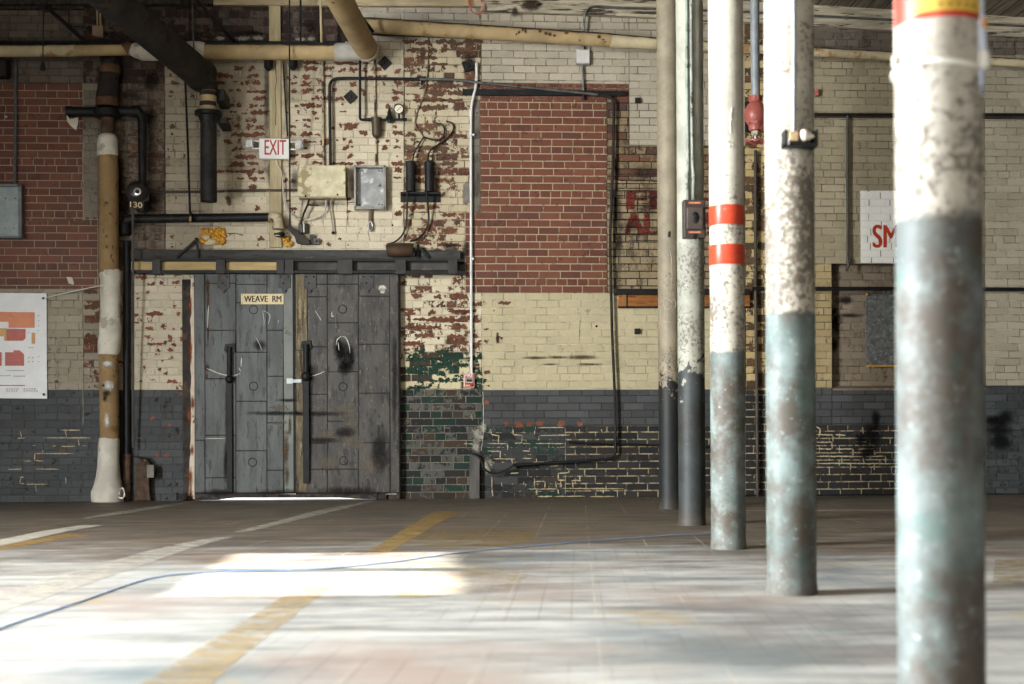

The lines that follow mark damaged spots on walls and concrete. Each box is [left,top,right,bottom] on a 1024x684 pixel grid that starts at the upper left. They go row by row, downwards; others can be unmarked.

peeling [217,38,485,189]
peeling [394,204,462,247]
peeling [84,289,100,338]
peeling [135,275,181,294]
peeling [134,305,182,396]
peeling [403,277,501,404]